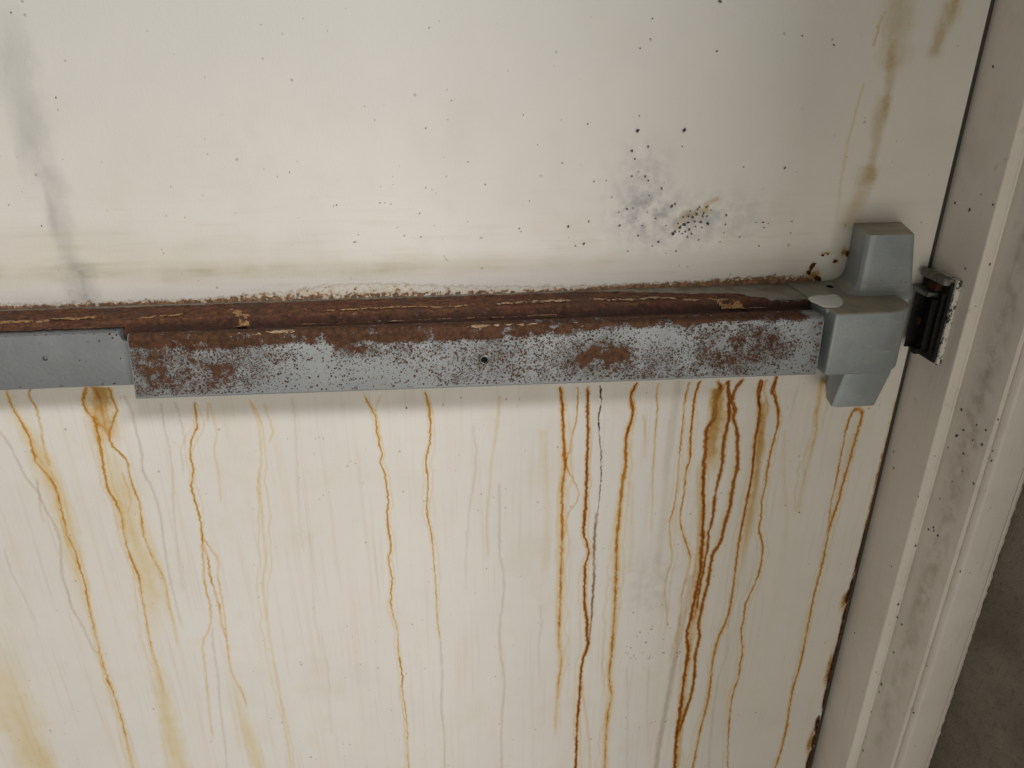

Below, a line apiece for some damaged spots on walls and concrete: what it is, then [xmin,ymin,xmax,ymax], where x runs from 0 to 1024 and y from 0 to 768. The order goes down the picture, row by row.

rust [0,291,823,768]
rust [791,408,863,698]
rust [806,505,871,768]